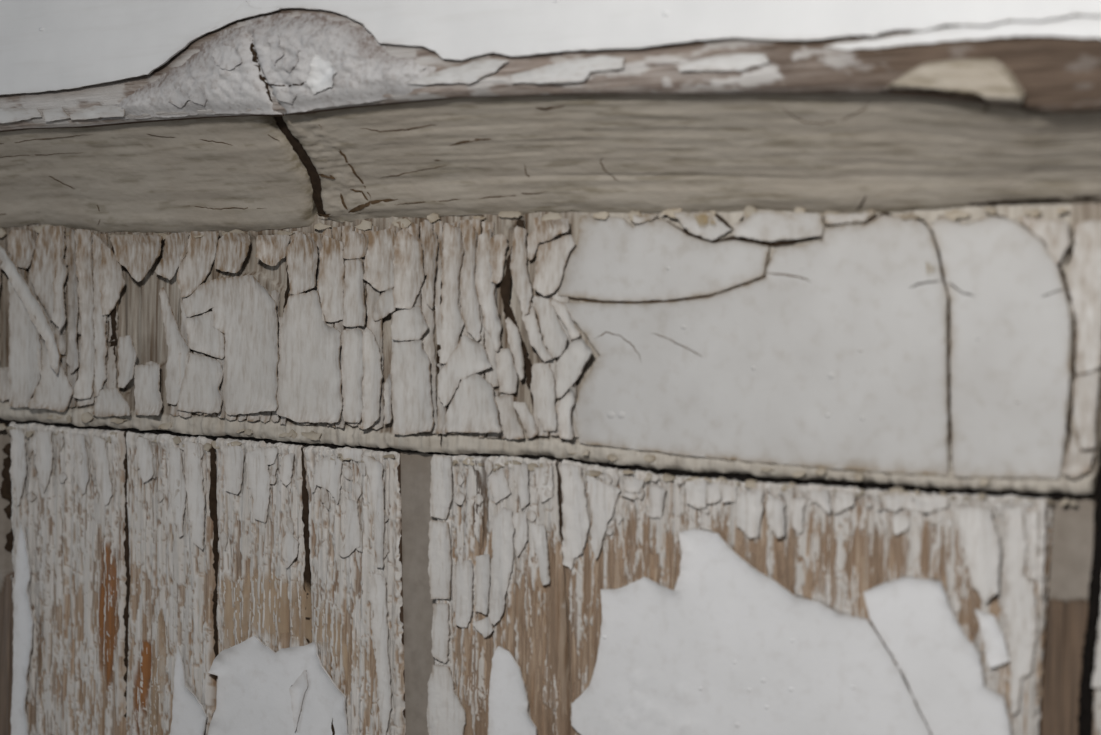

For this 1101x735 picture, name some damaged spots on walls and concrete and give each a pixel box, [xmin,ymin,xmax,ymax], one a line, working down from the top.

crack [0,135,80,189]
peeling [0,105,125,123]
crack [250,36,544,413]
peeling [0,0,1101,95]
crack [0,196,1100,717]
peeling [0,205,1101,735]